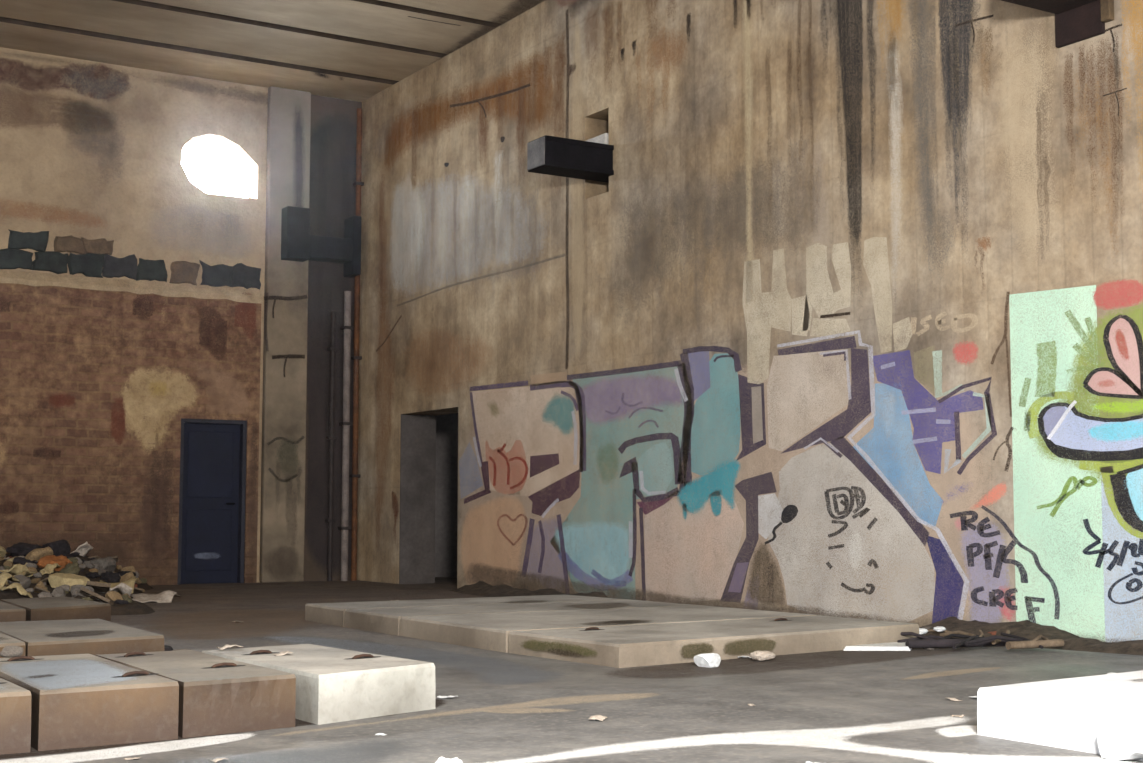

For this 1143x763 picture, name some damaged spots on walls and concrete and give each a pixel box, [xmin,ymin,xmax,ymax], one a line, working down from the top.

corrosion [373,32,566,559]
damp [582,0,1058,338]